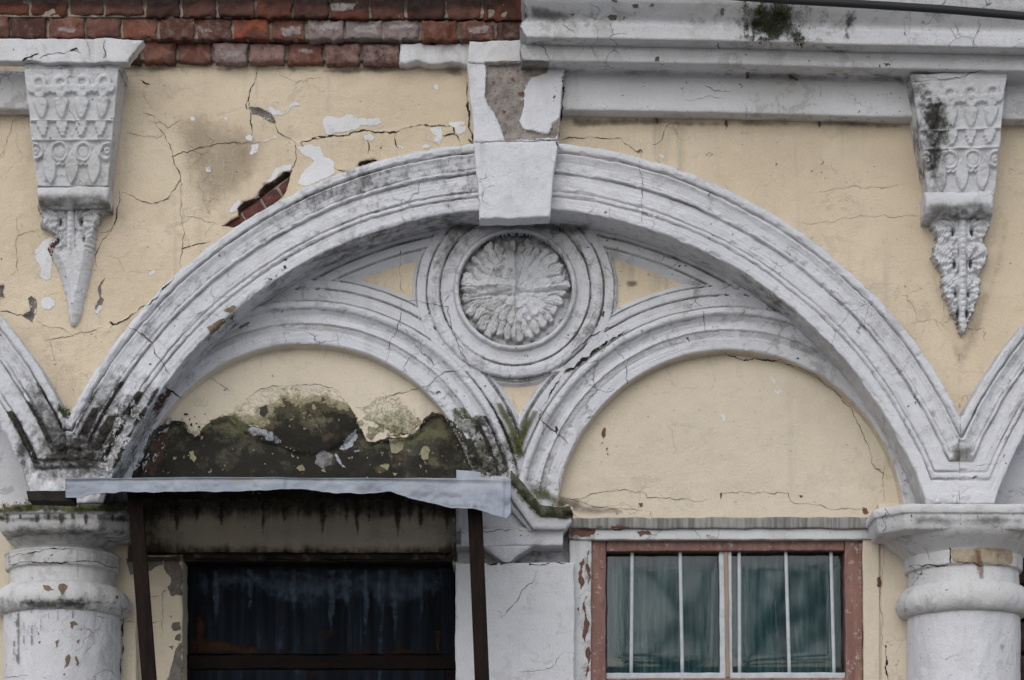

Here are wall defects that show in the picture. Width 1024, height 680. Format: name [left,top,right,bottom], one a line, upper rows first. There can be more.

peeling [323,114,382,141]
spalling [484,60,558,141]
water stain [920,95,954,177]
spalling [223,144,335,227]
crack [0,41,668,398]
water stain [7,381,160,469]
water stain [143,497,457,562]
water stain [535,490,578,518]
crack [539,327,1010,677]
peeling [43,583,67,595]
crack [487,561,565,617]
peeling [577,551,591,676]